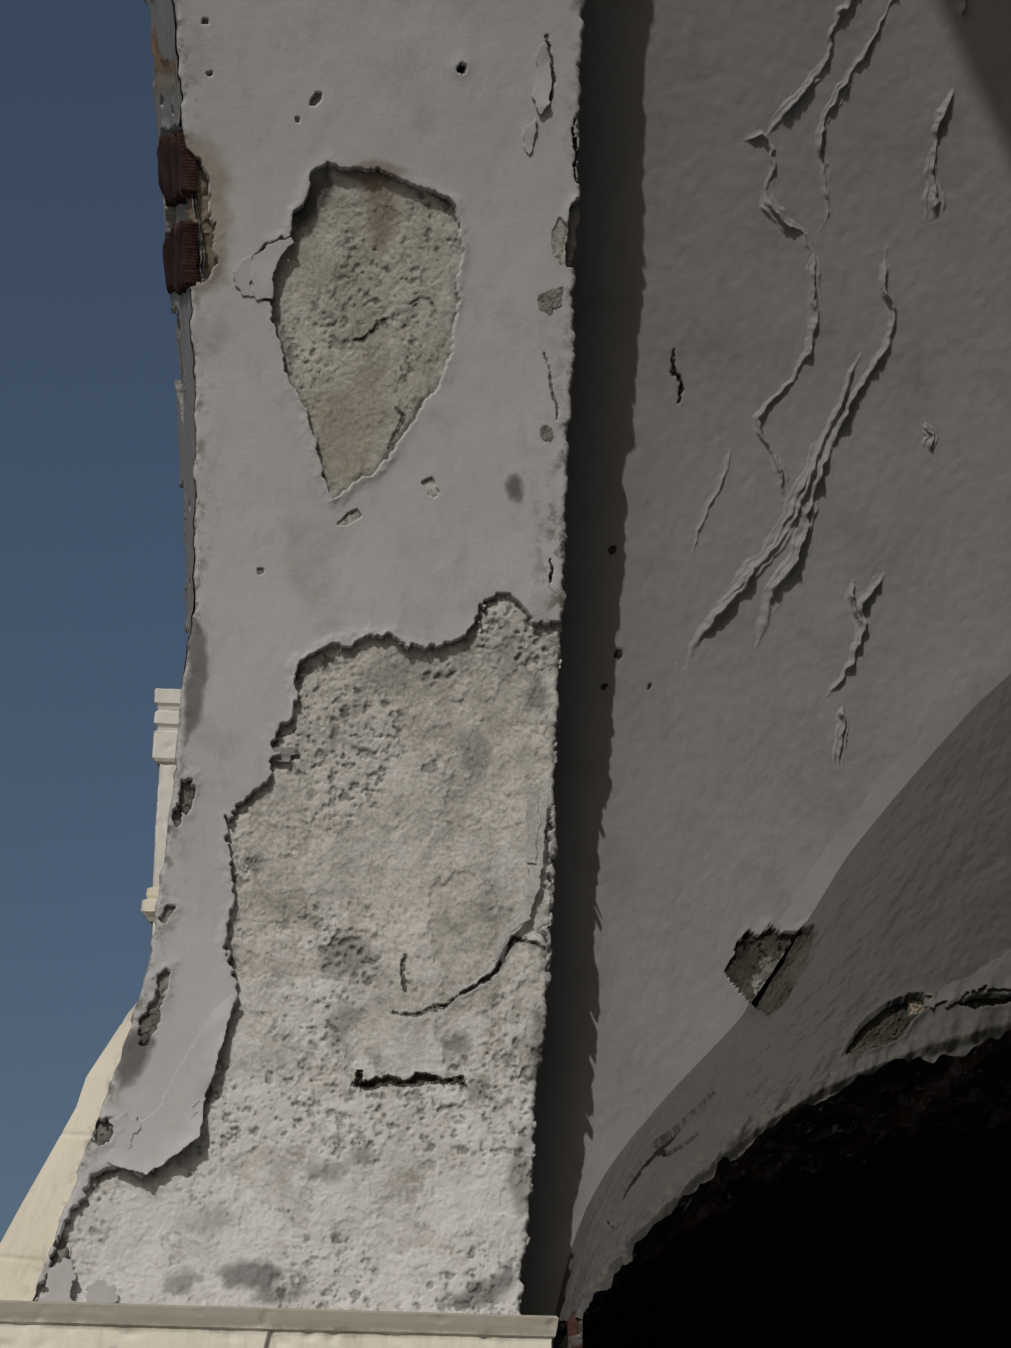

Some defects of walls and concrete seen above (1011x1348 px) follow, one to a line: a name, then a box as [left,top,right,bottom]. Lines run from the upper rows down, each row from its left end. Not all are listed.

flaking render [157,105,218,296]
spalling [233,164,463,499]
crack [670,348,685,404]
spalling [33,594,562,1315]
crack [391,934,547,1017]
spalling [724,925,814,1016]
peeling [845,949,1011,1056]